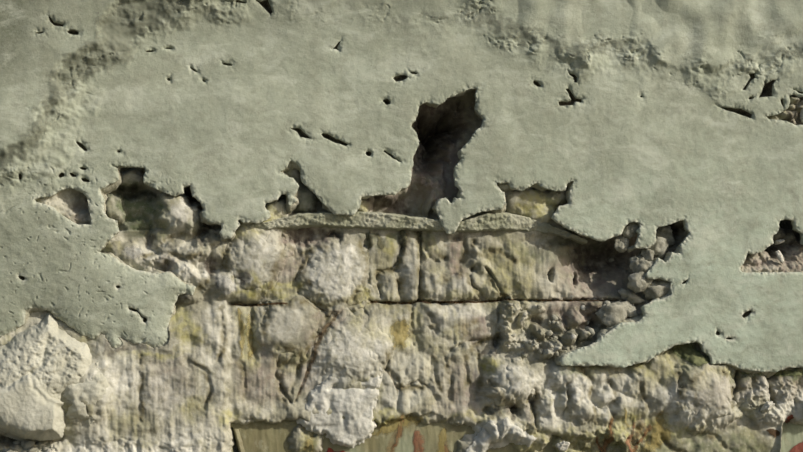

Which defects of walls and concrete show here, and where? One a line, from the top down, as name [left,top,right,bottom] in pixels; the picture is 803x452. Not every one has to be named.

damp [0,0,182,163]
spalling [720,107,752,118]
spalling [743,74,803,125]
spalling [0,90,687,452]
spalling [740,222,803,273]
crack [233,300,288,308]
crack [370,297,619,305]
damp [391,319,409,348]
damp [296,367,423,452]
rust [413,431,425,452]
damp [466,417,537,452]
spalling [485,345,803,452]